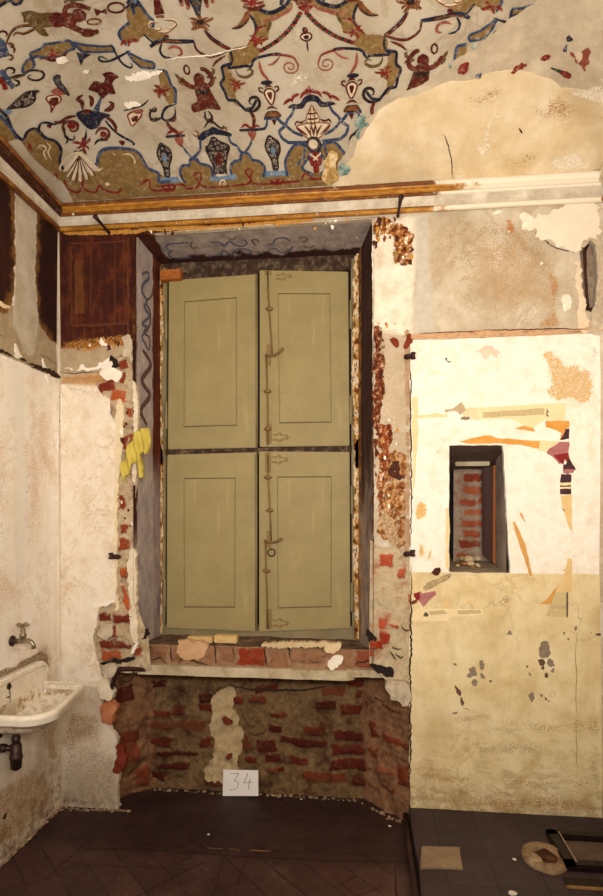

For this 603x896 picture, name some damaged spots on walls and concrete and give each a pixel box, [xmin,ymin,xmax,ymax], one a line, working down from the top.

crack [165,46,247,61]
peeling [322,0,603,187]
peeling [372,216,415,266]
peeling [519,212,535,231]
spalling [42,266,164,725]
spalling [112,742,130,774]